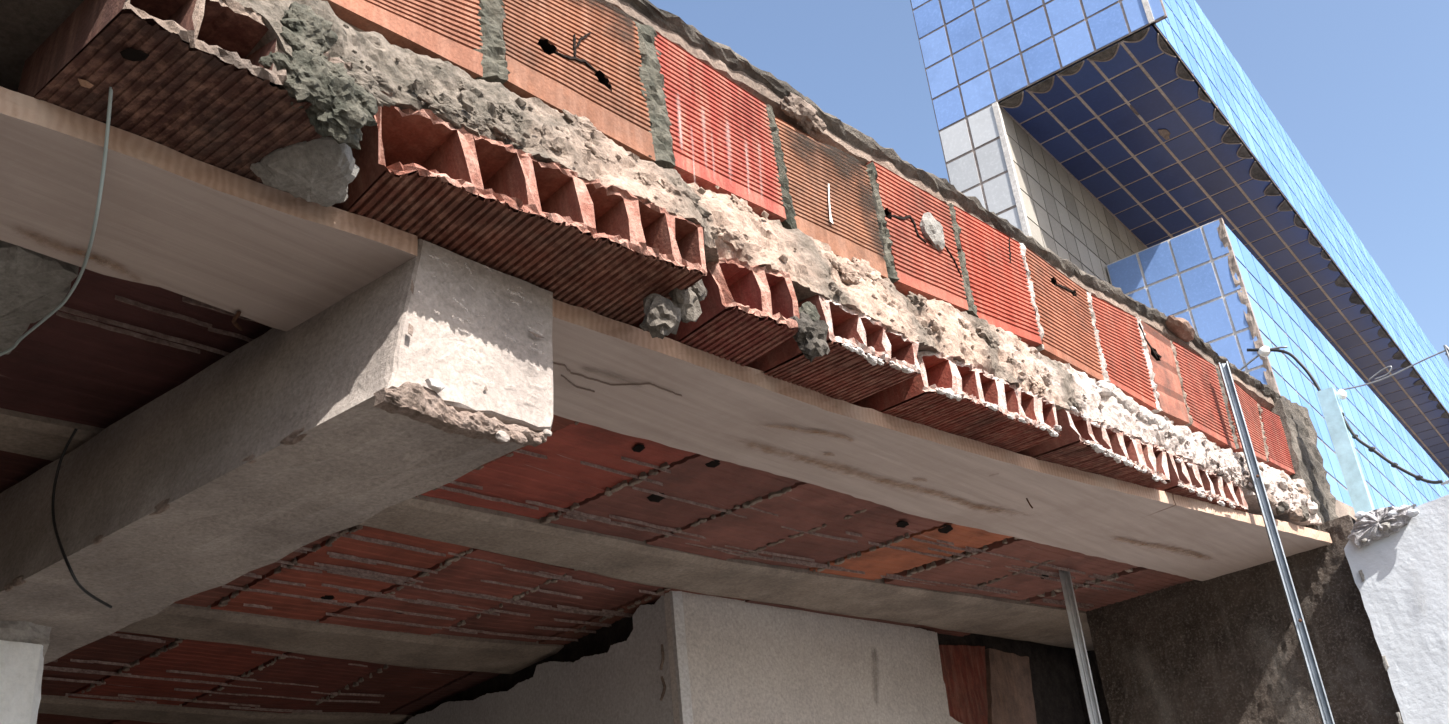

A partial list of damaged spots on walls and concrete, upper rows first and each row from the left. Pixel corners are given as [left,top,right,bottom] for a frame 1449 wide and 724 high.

crack [555,32,597,72]
spalling [999,27,1449,419]
crack [890,215,962,277]
crack [553,362,682,396]
spalling [373,379,552,447]
spalling [646,493,665,502]
spalling [1348,504,1419,548]